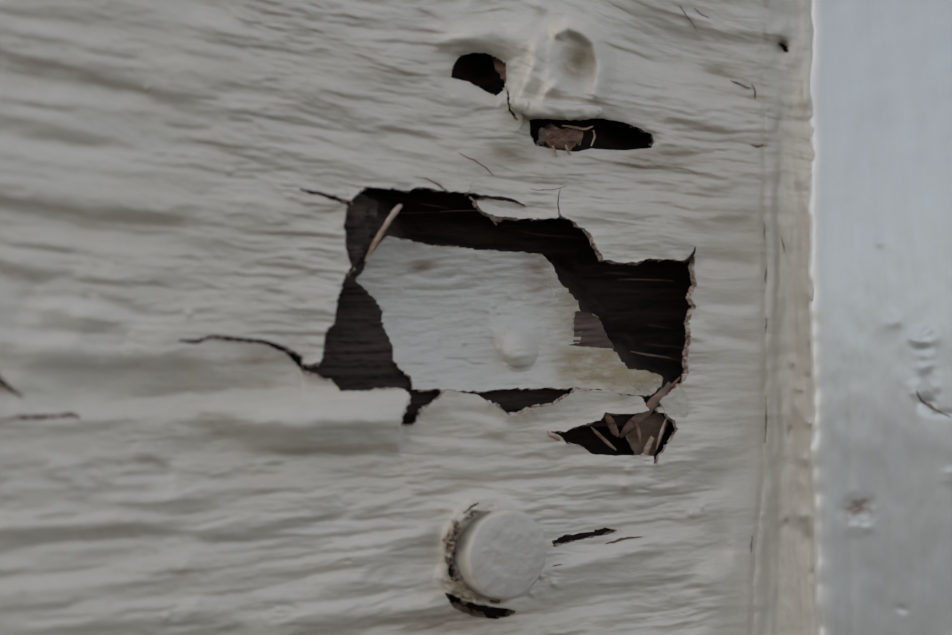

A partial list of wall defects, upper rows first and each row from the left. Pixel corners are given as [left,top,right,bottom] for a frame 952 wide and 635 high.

spalling [451,53,514,117]
spalling [529,118,652,152]
peeling [299,187,697,463]
crack [179,335,309,371]
crack [0,377,80,421]
crack [552,528,640,566]